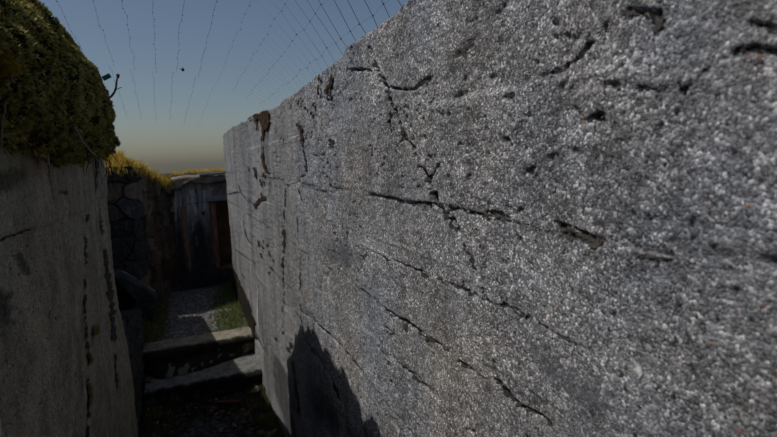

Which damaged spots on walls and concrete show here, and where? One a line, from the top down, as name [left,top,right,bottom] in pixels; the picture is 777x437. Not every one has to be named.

crack [512,24,608,77]
crack [632,68,708,127]
crack [350,49,552,267]
crack [229,184,255,278]
crack [281,149,359,400]
crack [362,246,597,357]
crack [381,309,554,429]